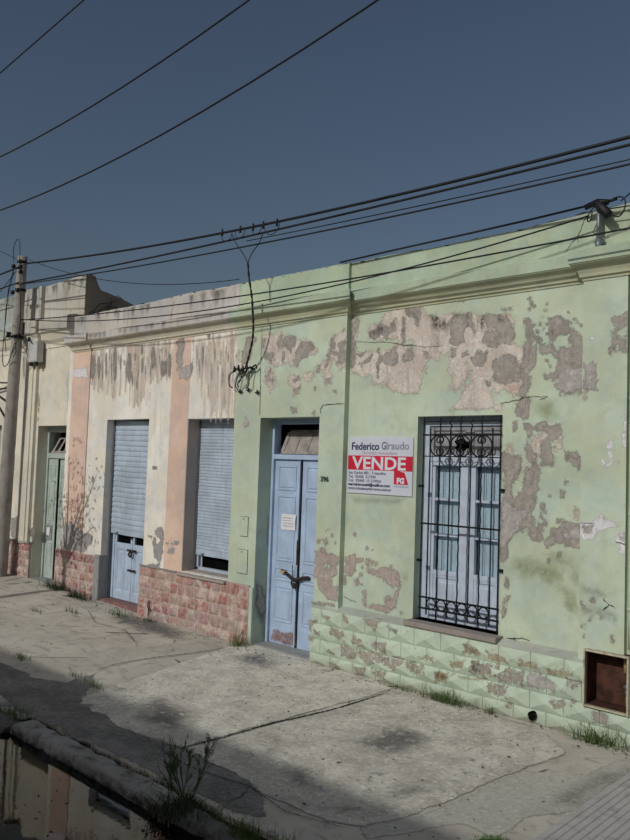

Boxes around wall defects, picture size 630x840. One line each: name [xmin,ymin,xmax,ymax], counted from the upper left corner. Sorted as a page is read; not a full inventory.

peeling [73,297,627,568]
peeling [63,520,93,552]
peeling [270,629,296,646]
peeling [308,529,433,679]
peeling [434,644,581,709]
crack [159,692,388,827]